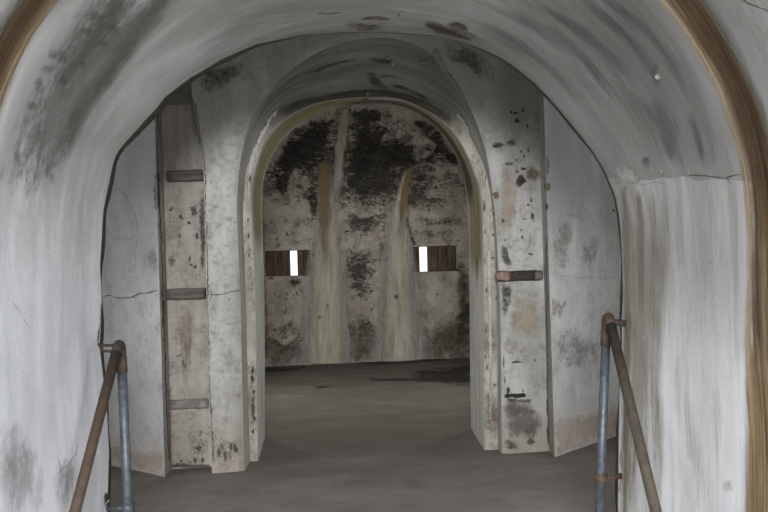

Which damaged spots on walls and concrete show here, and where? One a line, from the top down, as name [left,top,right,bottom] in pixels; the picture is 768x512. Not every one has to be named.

leakage [18,1,153,179]
crack [97,116,170,461]
leakage [264,74,470,382]
leakage [506,398,539,449]
rust [660,0,768,512]